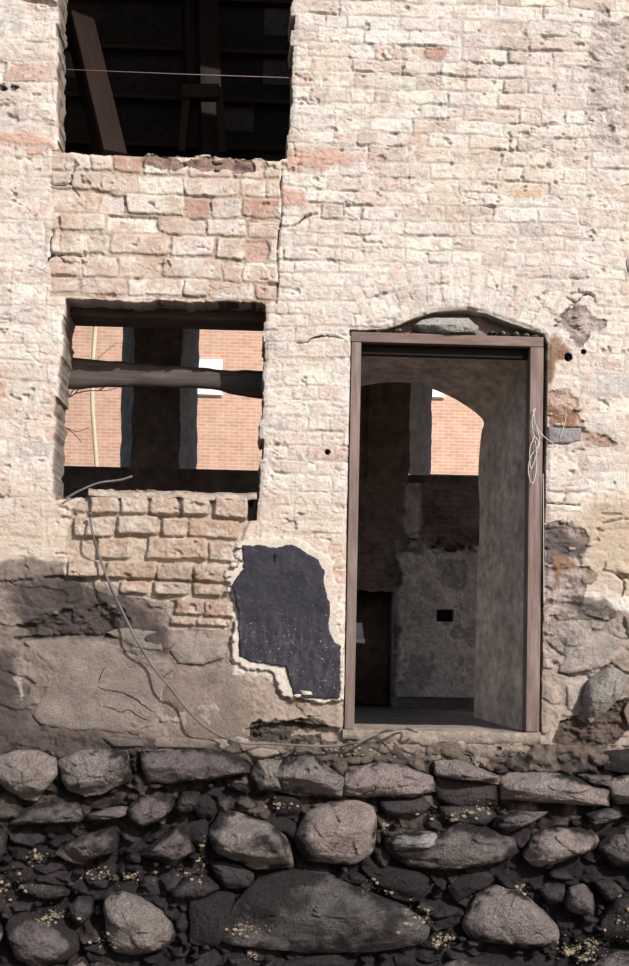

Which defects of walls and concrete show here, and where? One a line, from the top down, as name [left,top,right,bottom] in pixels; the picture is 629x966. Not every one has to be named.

spalling [554,303,607,348]
spalling [547,389,618,447]
peeling [357,481,480,698]
spalling [542,519,616,662]
spalling [16,605,126,639]
damp [144,628,168,654]
spalling [552,697,629,745]